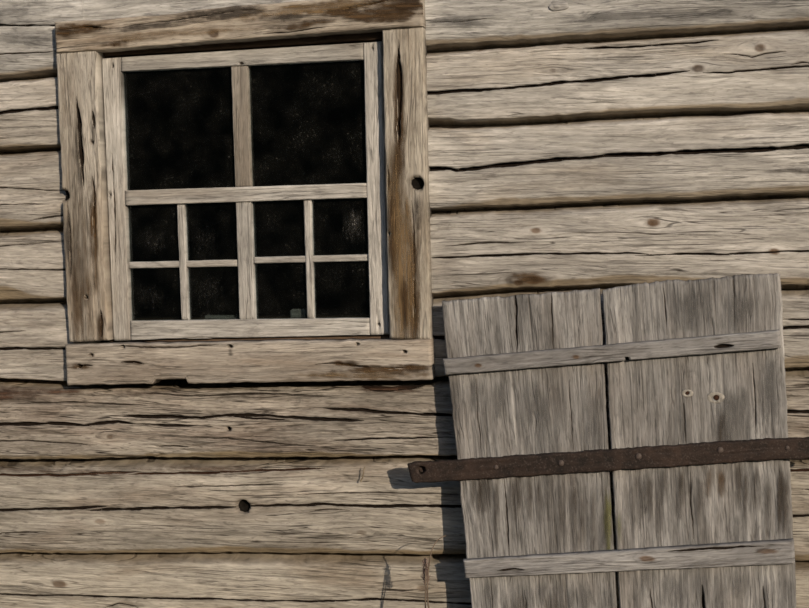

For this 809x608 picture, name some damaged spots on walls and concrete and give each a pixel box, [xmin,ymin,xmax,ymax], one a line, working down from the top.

crack [585,40,714,49]
crack [428,51,809,95]
crack [395,47,403,147]
crack [429,144,809,172]
crack [412,205,809,259]
crack [783,319,809,329]
crack [0,362,452,447]
crack [0,468,324,487]
crack [0,492,462,512]
crack [502,482,510,547]
crack [0,589,471,608]
crack [491,568,523,608]